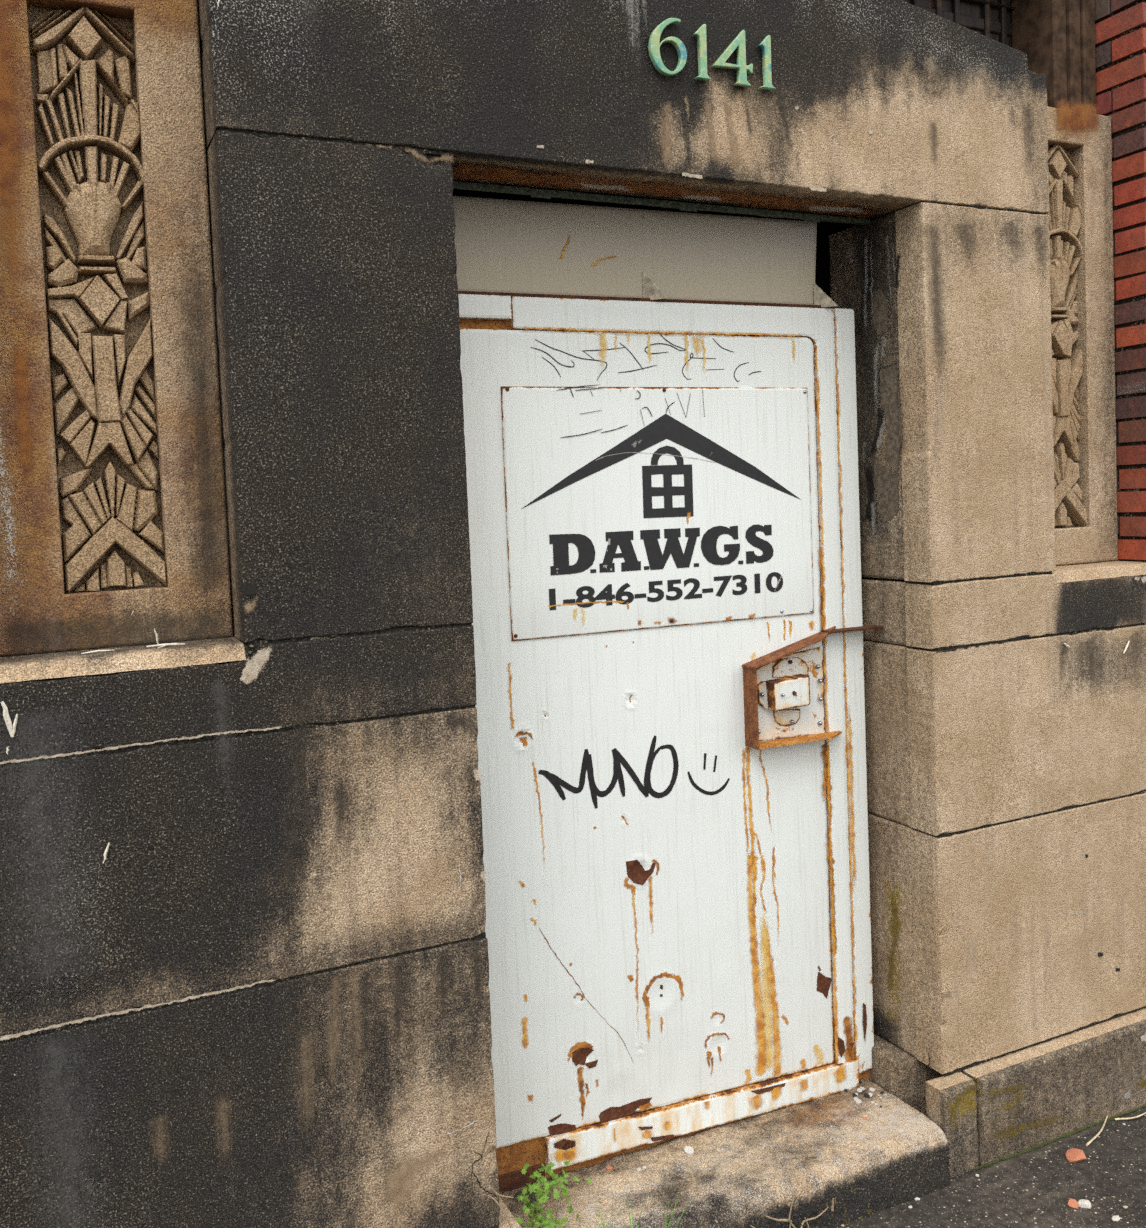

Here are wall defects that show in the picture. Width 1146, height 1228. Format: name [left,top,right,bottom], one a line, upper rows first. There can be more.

rust [524,327,801,368]
spalling [240,646,272,684]
rust [508,663,533,748]
rust [800,318,860,1091]
rust [532,763,545,851]
rust [627,876,685,1038]
rust [742,748,789,1110]
rust [705,1011,730,1074]
rust [577,1067,599,1116]
rust [555,1148,575,1162]